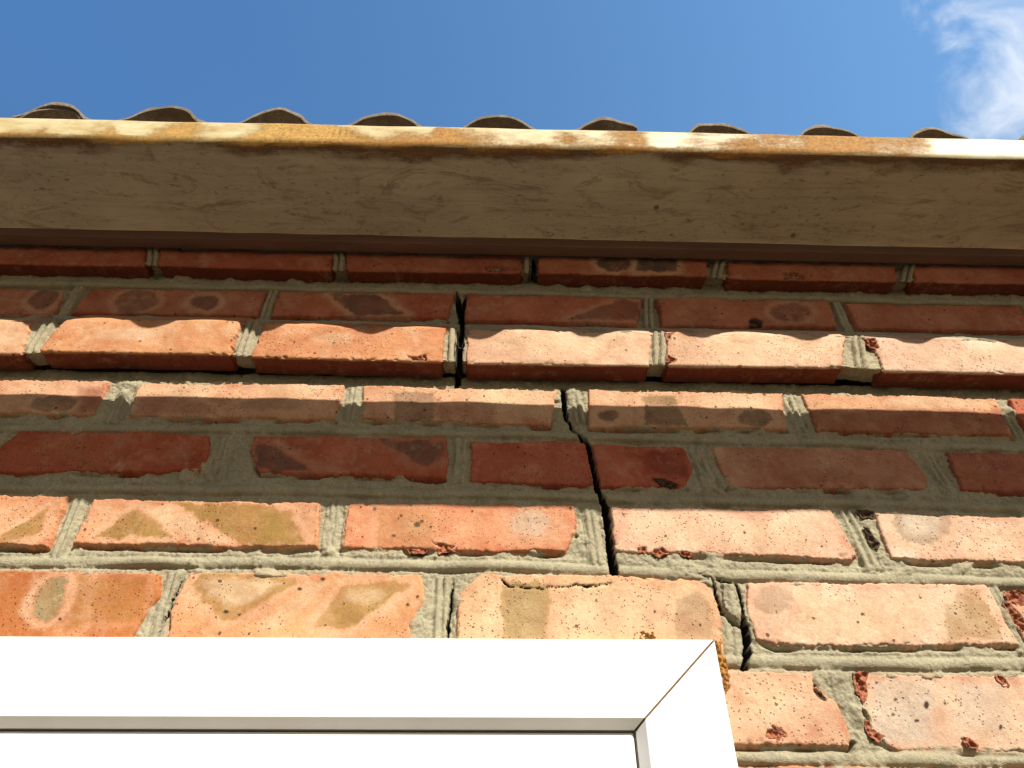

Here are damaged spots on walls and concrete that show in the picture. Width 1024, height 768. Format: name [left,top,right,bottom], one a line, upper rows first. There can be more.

crack [455,295,466,389]
crack [502,390,618,591]
spalling [407,541,455,554]
spalling [637,547,693,558]
crack [712,581,751,671]
spalling [1003,590,1024,632]
spalling [853,671,885,742]